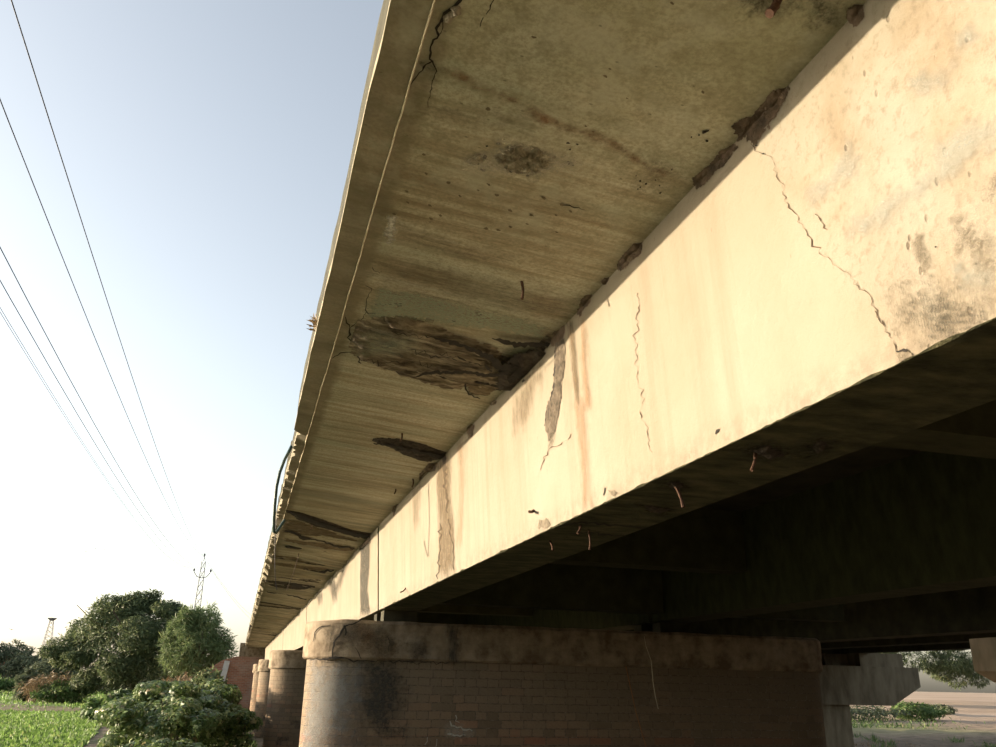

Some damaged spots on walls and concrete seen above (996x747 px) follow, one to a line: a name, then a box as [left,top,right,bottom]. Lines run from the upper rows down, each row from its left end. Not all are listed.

crack [410,0,494,100]
spalling [692,86,790,189]
spalling [577,294,592,317]
spalling [600,243,642,285]
crack [751,141,896,351]
spalling [348,315,565,442]
spalling [372,433,447,488]
spalling [259,510,371,610]